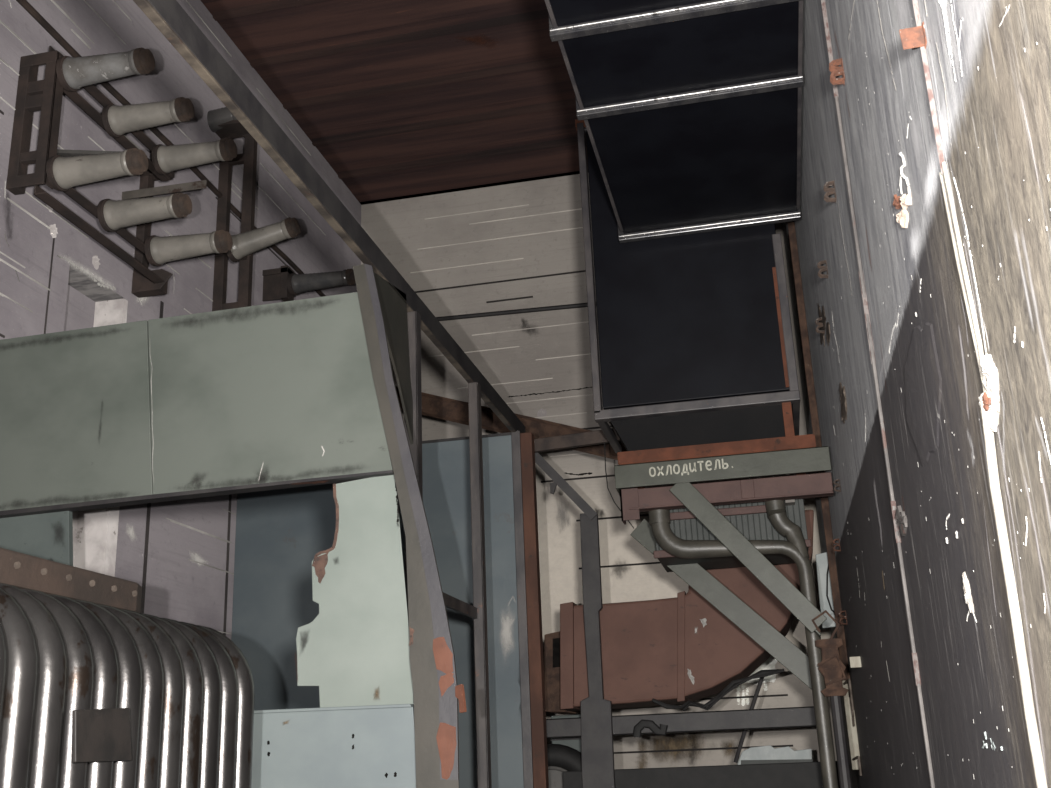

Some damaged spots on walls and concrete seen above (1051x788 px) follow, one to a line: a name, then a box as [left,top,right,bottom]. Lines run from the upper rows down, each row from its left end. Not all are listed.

peeling [938,0,962,82]
peeling [893,152,912,228]
spalling [979,354,1000,432]
peeling [962,572,977,622]